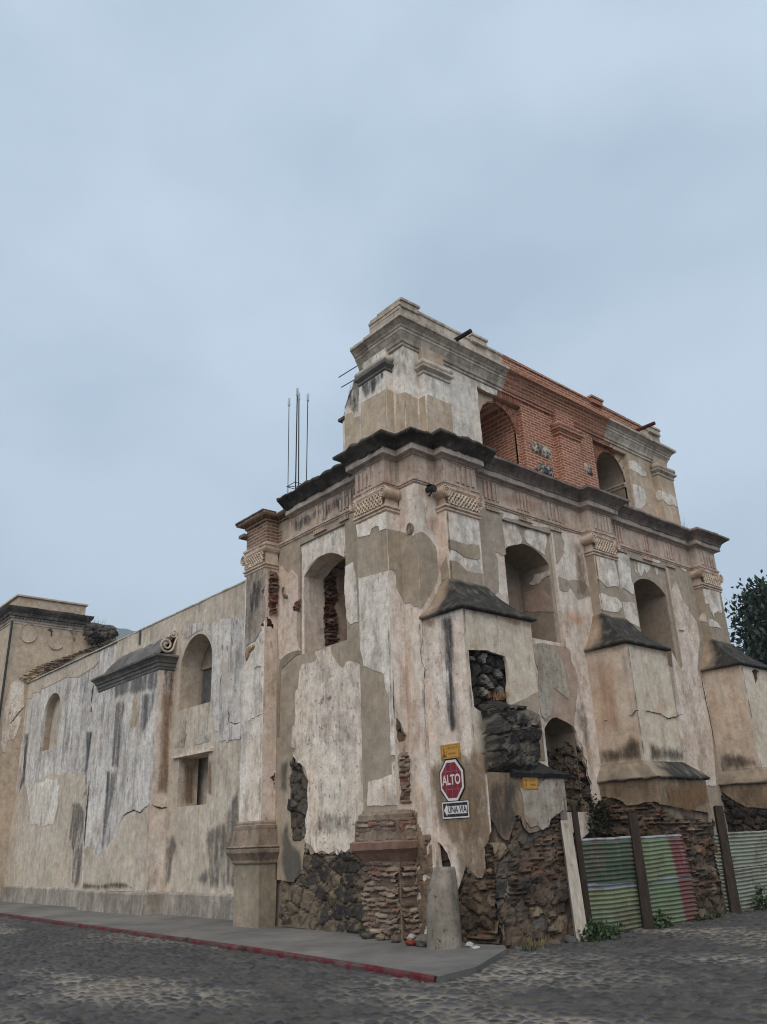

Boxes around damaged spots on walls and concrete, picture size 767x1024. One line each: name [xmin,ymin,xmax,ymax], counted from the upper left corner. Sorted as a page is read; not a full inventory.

leakage [70,732,126,888]
leakage [102,669,174,847]
peeling [245,568,301,661]
spalling [393,719,451,935]
leakage [442,617,455,729]
crack [604,674,716,747]